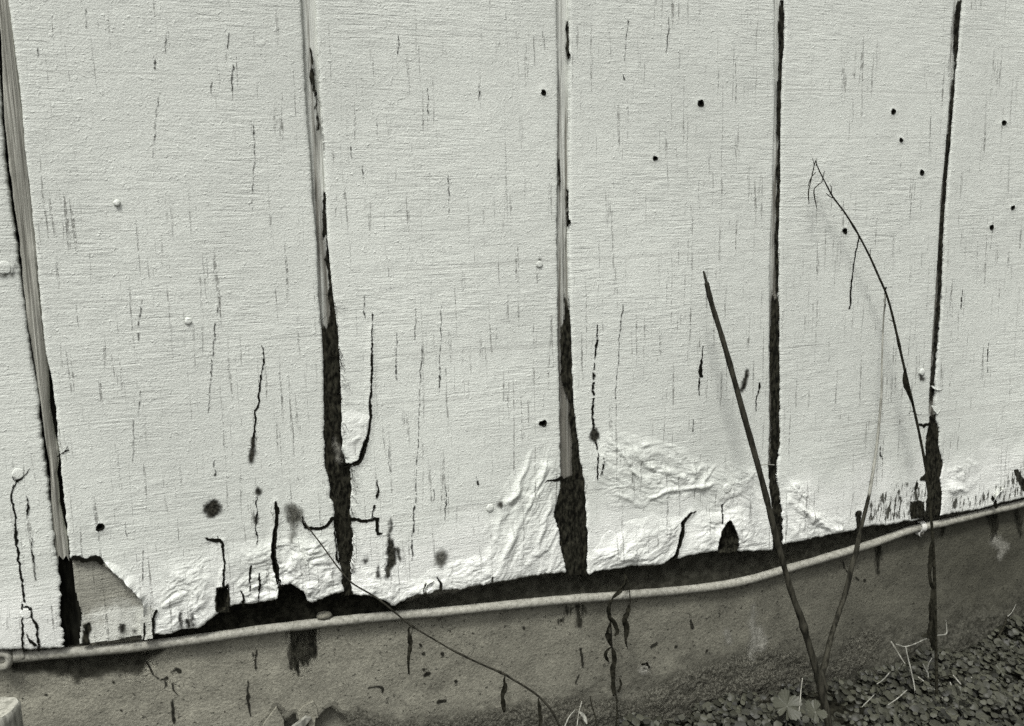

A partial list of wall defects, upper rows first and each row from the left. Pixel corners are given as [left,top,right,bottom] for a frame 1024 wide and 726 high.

water stain [150,0,948,640]
crack [205,296,447,607]
crack [10,468,40,652]
peeling [71,555,158,643]
water stain [292,634,317,675]
crack [671,511,696,561]
water stain [749,605,766,661]
water stain [992,535,1008,559]